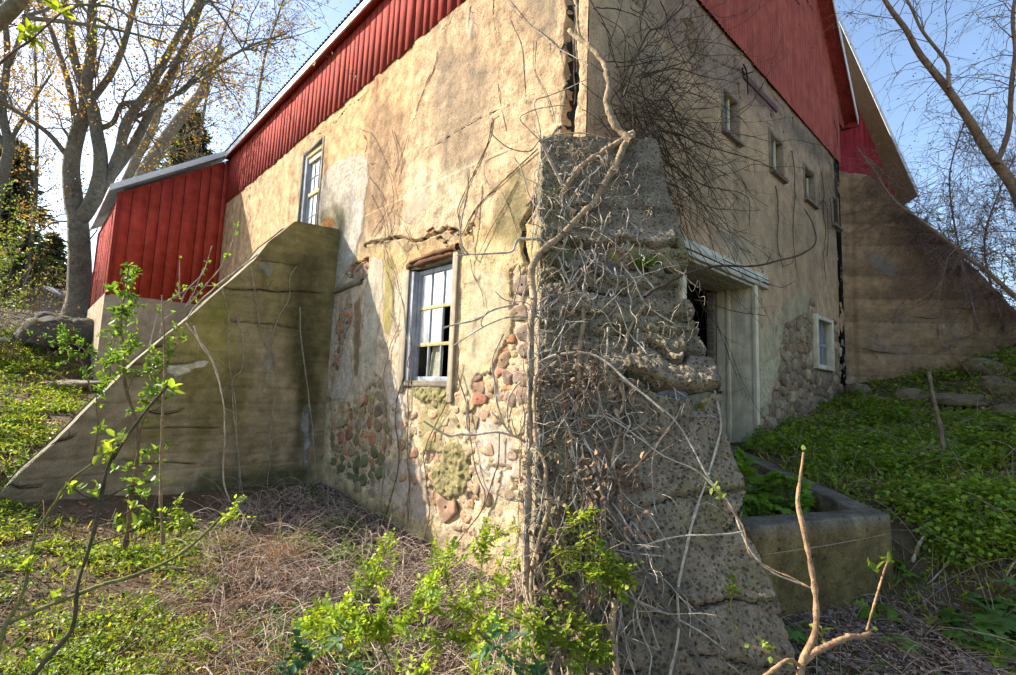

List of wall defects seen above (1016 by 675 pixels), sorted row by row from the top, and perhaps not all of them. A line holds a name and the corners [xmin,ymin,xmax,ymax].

crack [551,0,580,136]
crack [225,259,317,293]
crack [329,223,474,402]
flaking render [329,261,536,536]
flaking render [760,300,847,432]